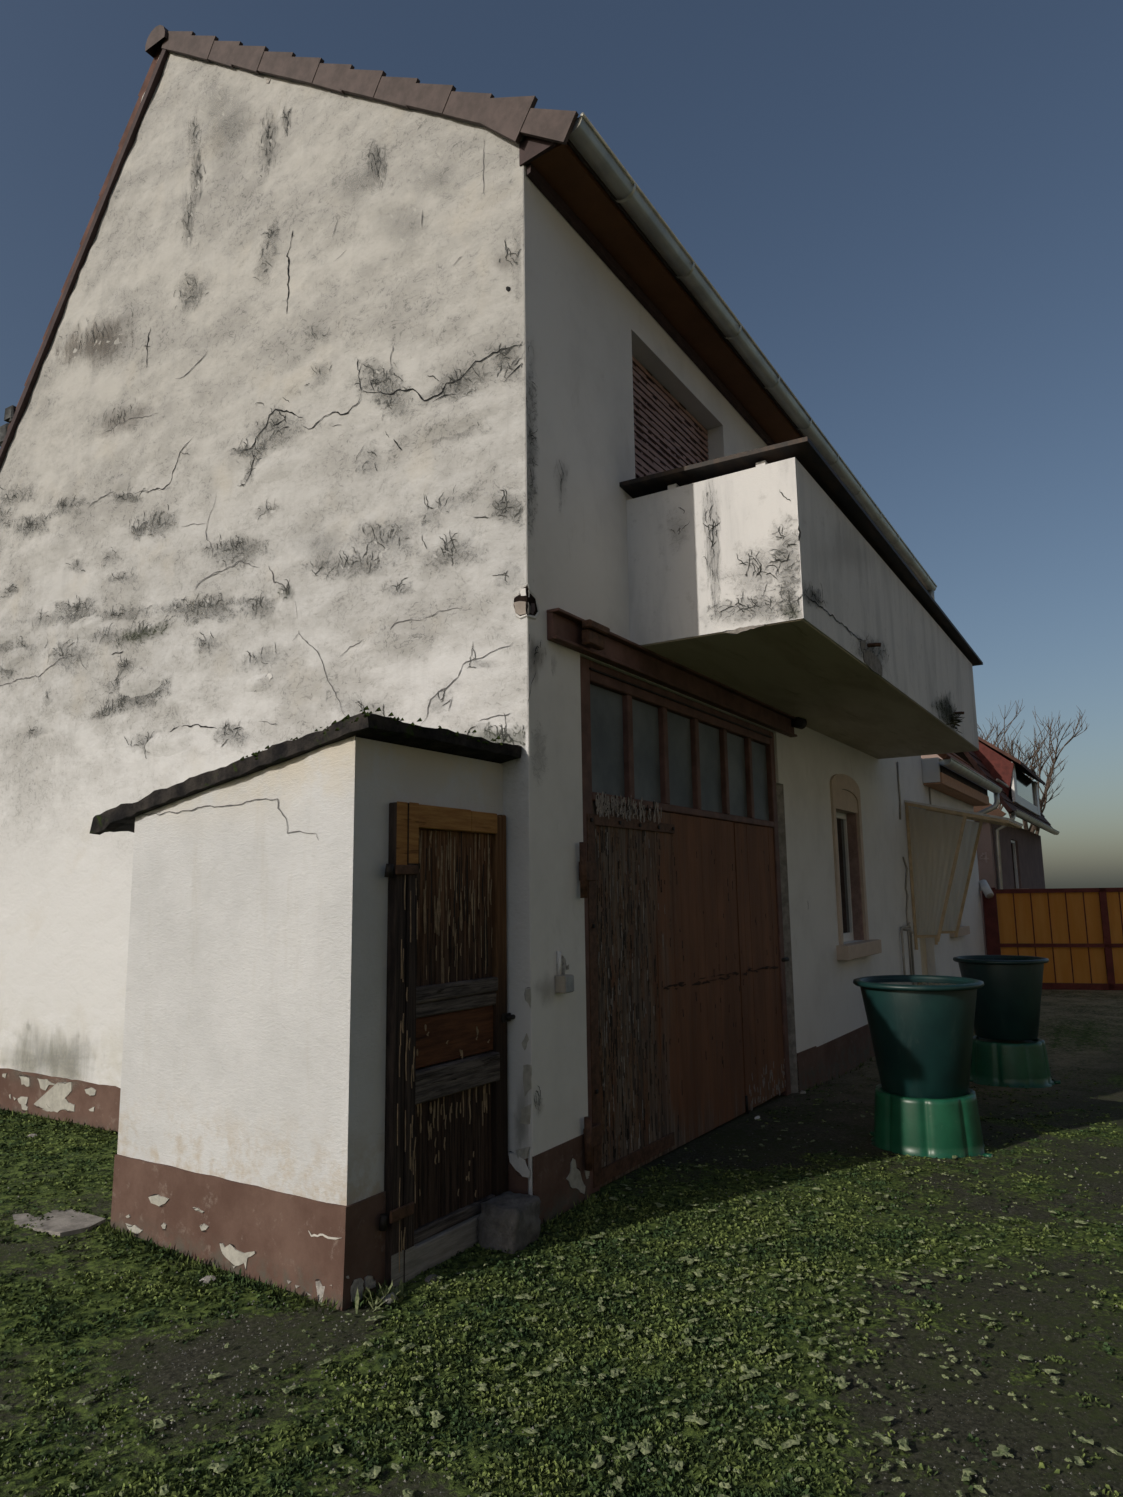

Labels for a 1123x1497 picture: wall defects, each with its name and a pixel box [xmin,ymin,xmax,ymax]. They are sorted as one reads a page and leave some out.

water stain [428,344,538,524]
crack [182,347,522,714]
water stain [304,525,457,579]
water stain [711,527,826,620]
water stain [169,593,273,649]
water stain [94,657,171,719]
crack [420,644,536,726]
crack [142,798,318,838]
peeling [2,1073,96,1112]
peeling [125,1214,143,1235]
peeling [148,1194,169,1230]
peeling [193,1207,256,1269]